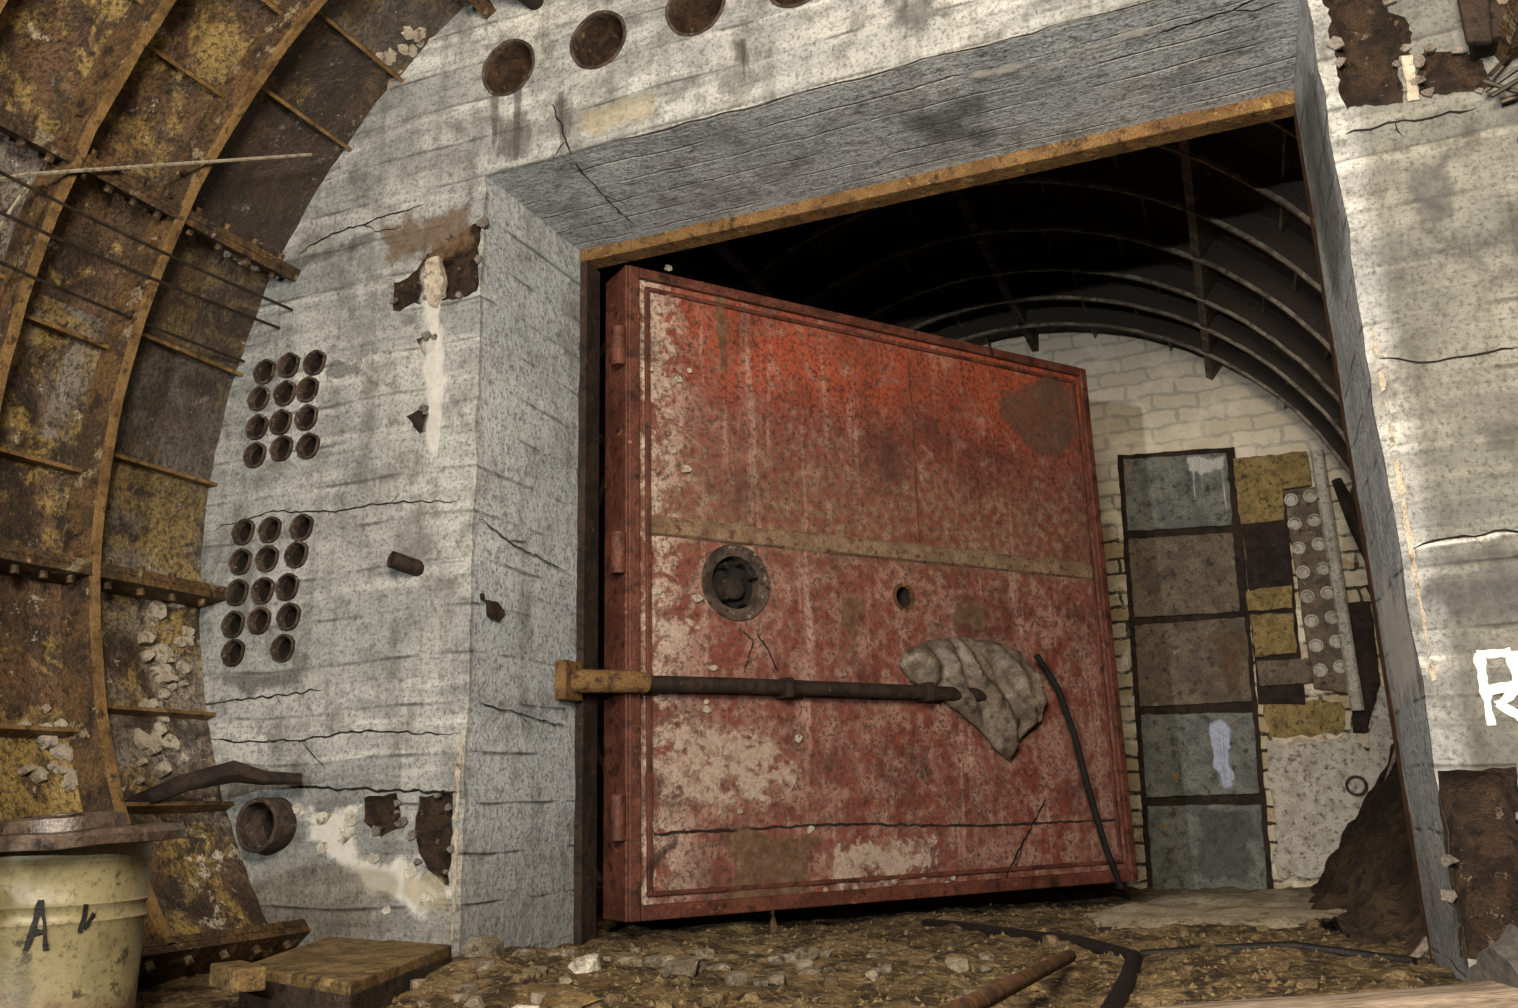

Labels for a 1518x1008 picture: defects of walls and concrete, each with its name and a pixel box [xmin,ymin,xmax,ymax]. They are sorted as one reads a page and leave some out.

spalling [1322,0,1490,110]
crack [552,104,633,224]
spalling [389,215,489,311]
rust [715,296,728,371]
peeling [292,731,463,942]
spalling [1438,761,1518,960]